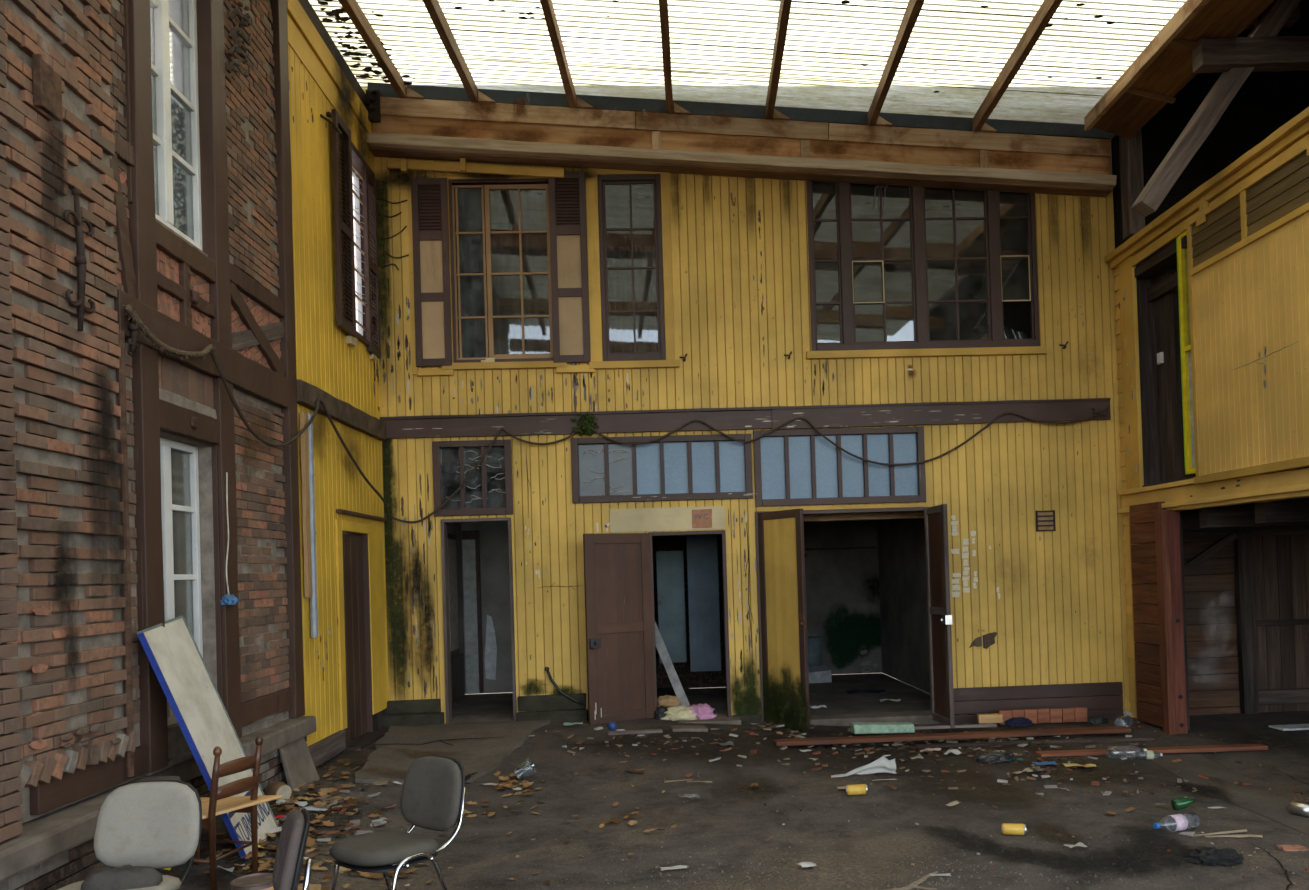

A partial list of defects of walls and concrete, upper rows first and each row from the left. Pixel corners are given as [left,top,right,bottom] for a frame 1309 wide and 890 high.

peeling [372,296,412,411]
peeling [443,363,647,434]
water stain [411,549,434,672]
peeling [957,629,997,649]